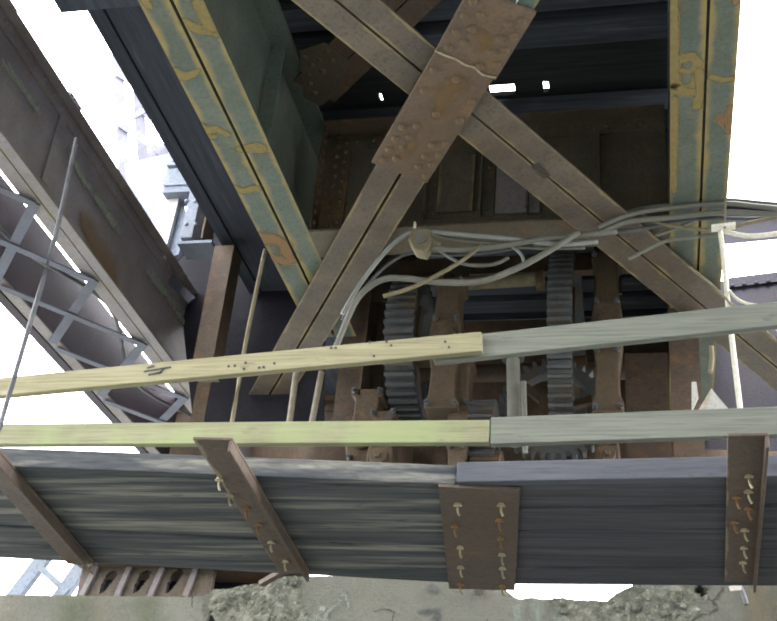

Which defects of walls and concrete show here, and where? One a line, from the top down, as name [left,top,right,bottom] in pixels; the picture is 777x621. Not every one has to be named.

spalling [202,575,308,621]
spalling [549,585,710,621]